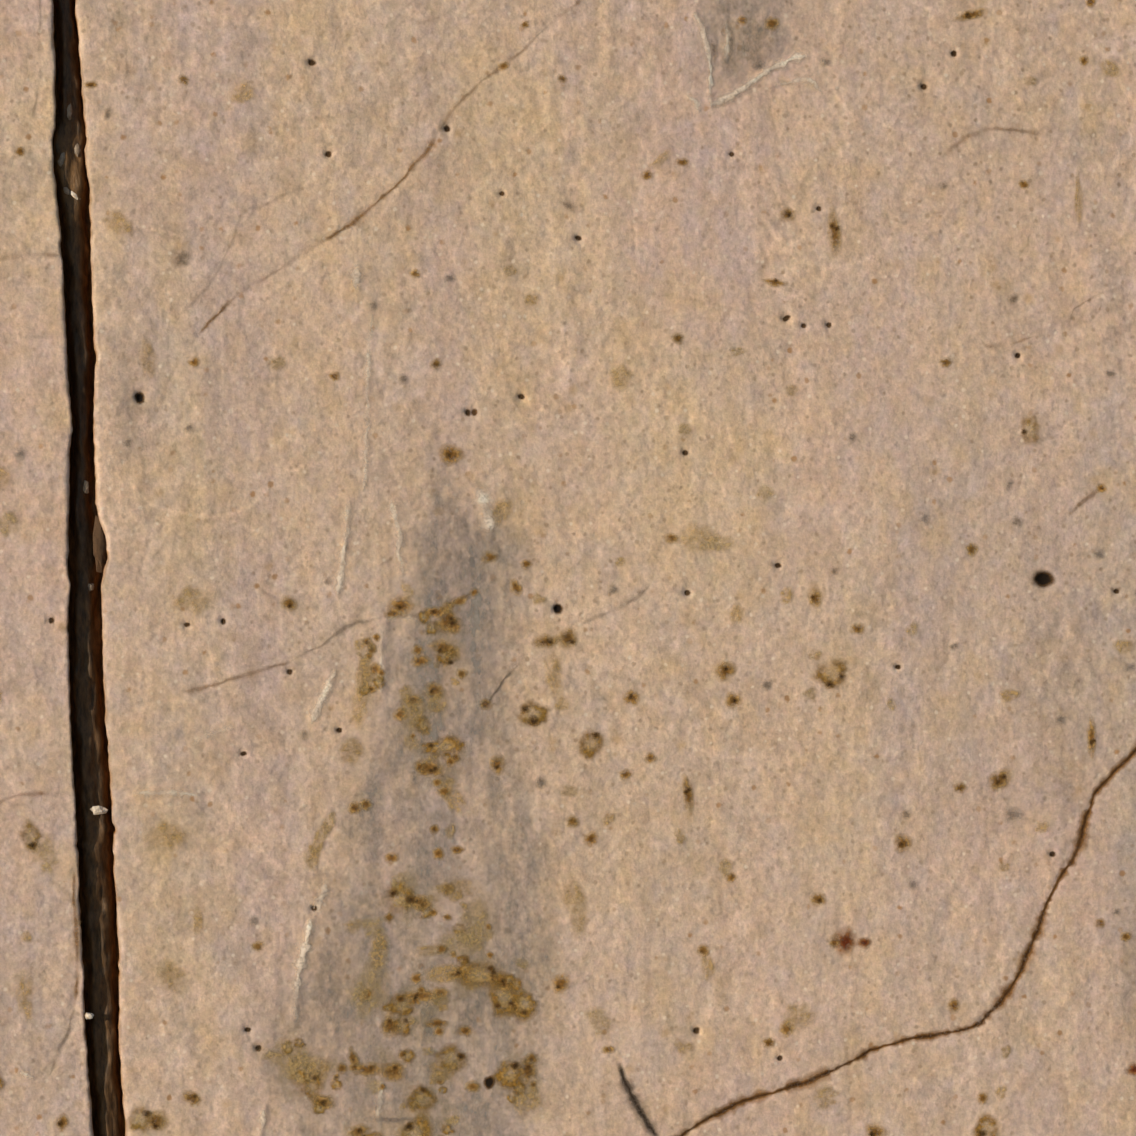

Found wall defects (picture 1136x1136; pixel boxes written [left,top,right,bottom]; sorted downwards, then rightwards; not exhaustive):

crack [327,142,434,239]
crack [202,304,227,331]
crack [619,747,1136,1136]